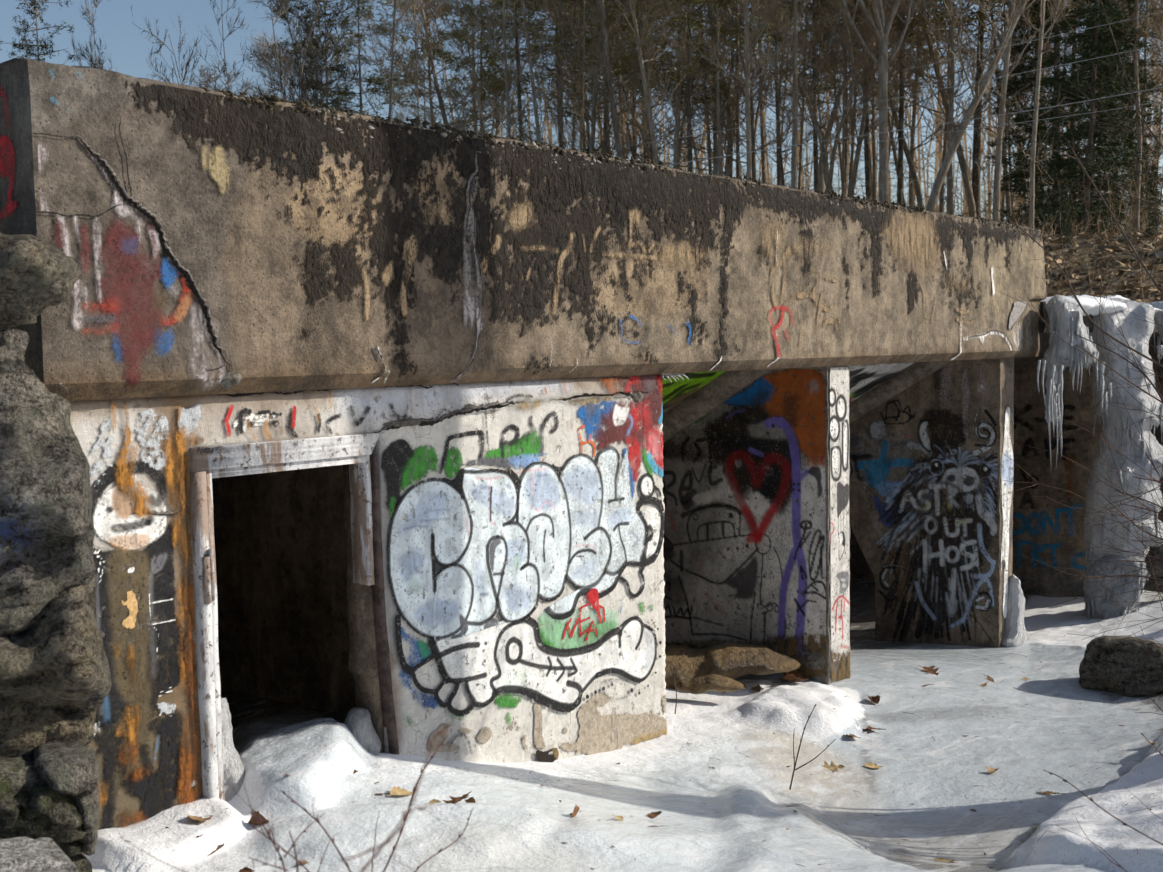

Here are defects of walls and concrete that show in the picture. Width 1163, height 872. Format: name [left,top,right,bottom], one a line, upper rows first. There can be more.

water stain [40,202,102,329]
water stain [114,189,160,256]
crack [33,112,345,397]
water stain [126,80,1042,399]
peeling [428,723,492,752]
peeling [522,693,667,762]